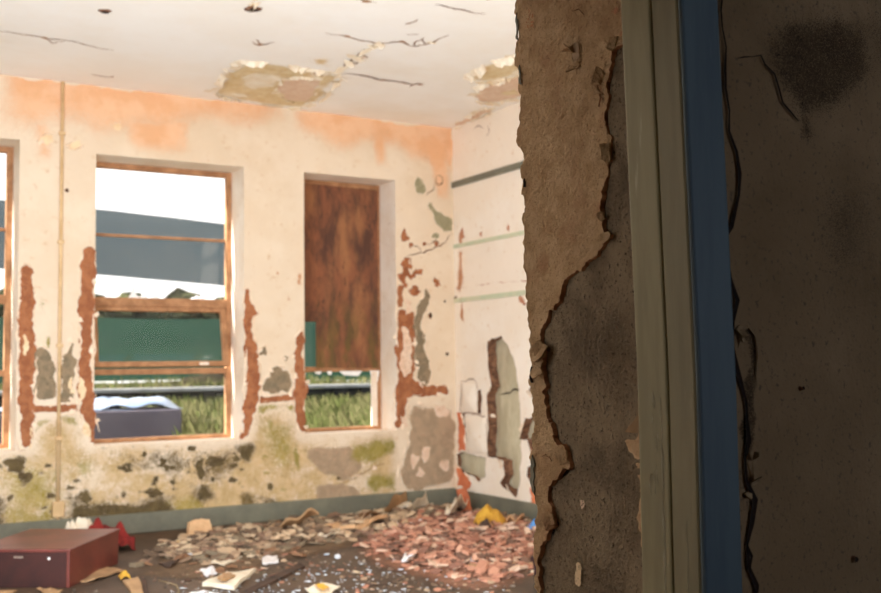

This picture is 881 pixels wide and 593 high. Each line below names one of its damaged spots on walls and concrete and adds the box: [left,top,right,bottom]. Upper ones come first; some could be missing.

crack [0,31,109,50]
peeling [203,60,343,111]
crack [327,19,448,87]
crack [720,0,799,234]
spalling [391,36,643,593]
leakage [0,403,402,524]
crack [731,275,759,593]